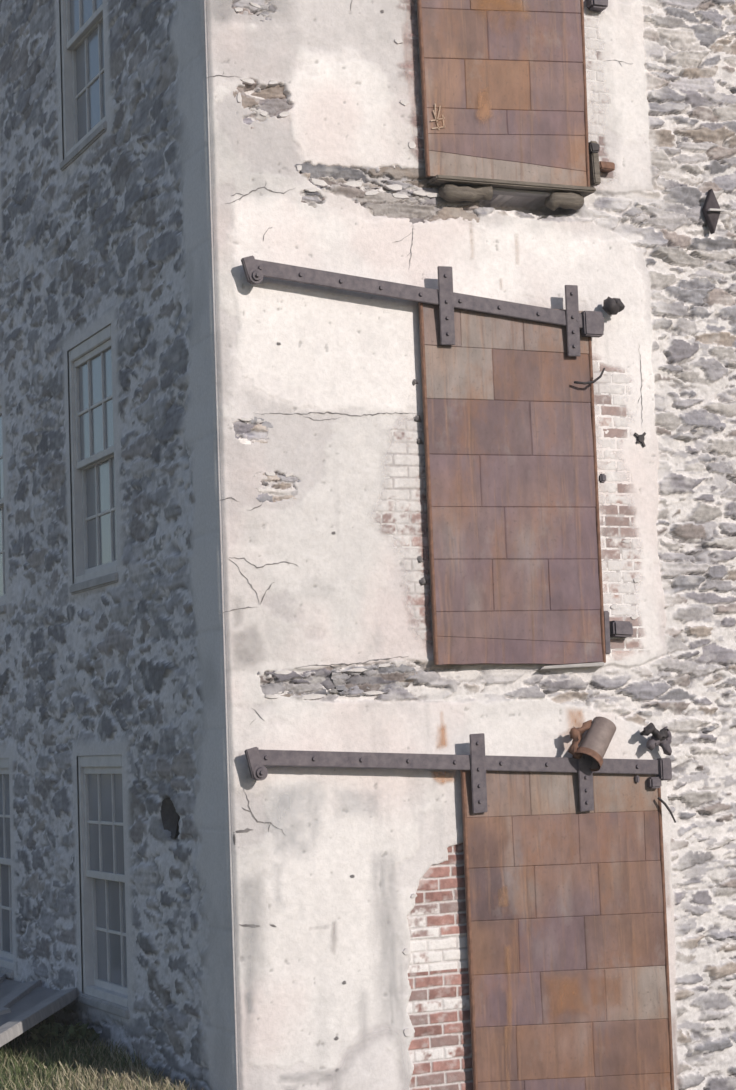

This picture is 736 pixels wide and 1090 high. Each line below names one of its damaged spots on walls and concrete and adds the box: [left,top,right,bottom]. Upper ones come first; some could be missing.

spalling [231,0,276,21]
flaking render [394,34,419,45]
spalling [233,78,293,129]
spalling [295,119,480,224]
spalling [233,417,273,445]
spalling [253,472,301,502]
flaking render [374,415,433,644]
crack [223,557,299,613]
spalling [257,662,417,700]
crack [233,793,285,844]
flaking render [403,843,473,1090]